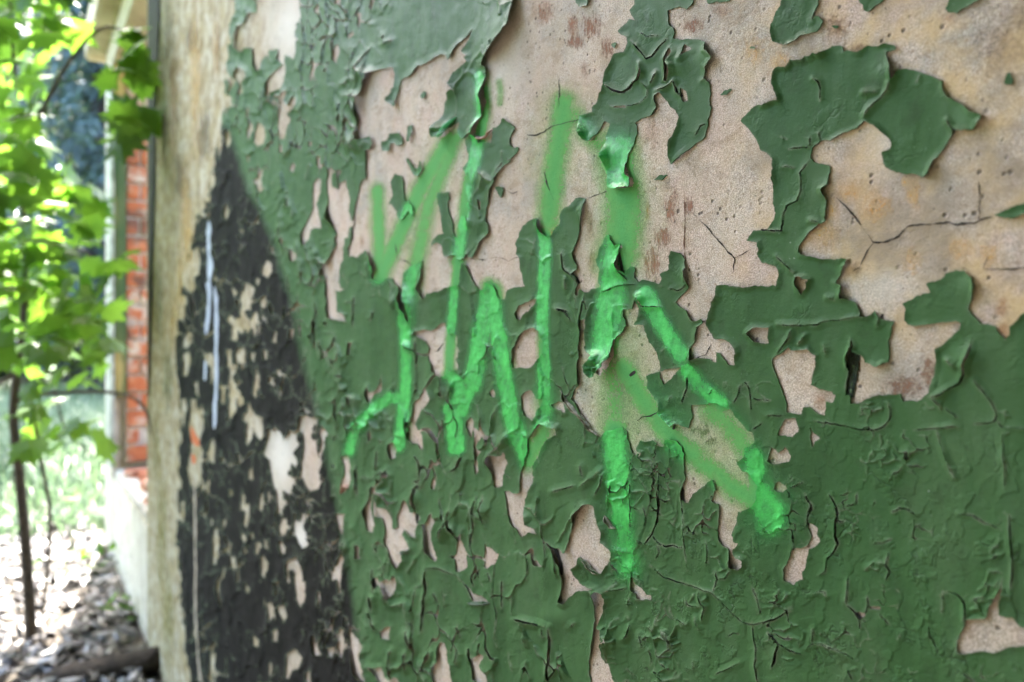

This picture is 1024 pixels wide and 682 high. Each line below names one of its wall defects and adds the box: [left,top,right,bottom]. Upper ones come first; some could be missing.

crack [607,134,994,307]
peeling [203,0,1024,607]
peeling [267,602,287,642]
peeling [269,626,398,682]
peeling [427,642,452,682]
peeling [469,654,487,682]
peeling [547,504,617,682]
peeling [957,587,1024,654]